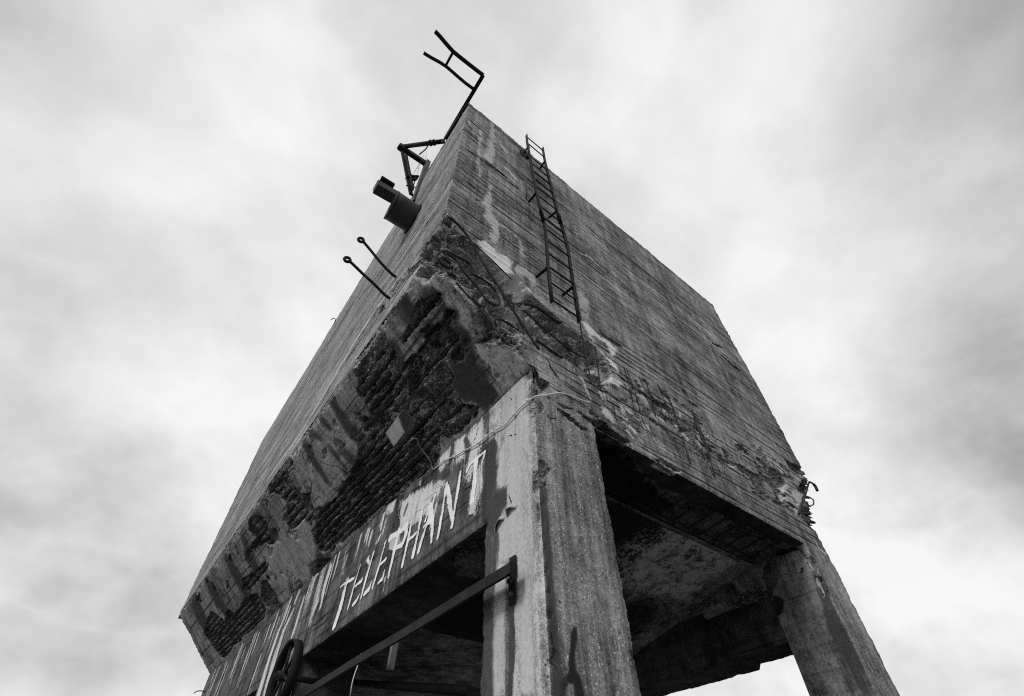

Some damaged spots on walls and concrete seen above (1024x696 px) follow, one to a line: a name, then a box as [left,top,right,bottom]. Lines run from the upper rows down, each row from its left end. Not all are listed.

leakage [457,119,542,338]
spalling [198,210,819,659]